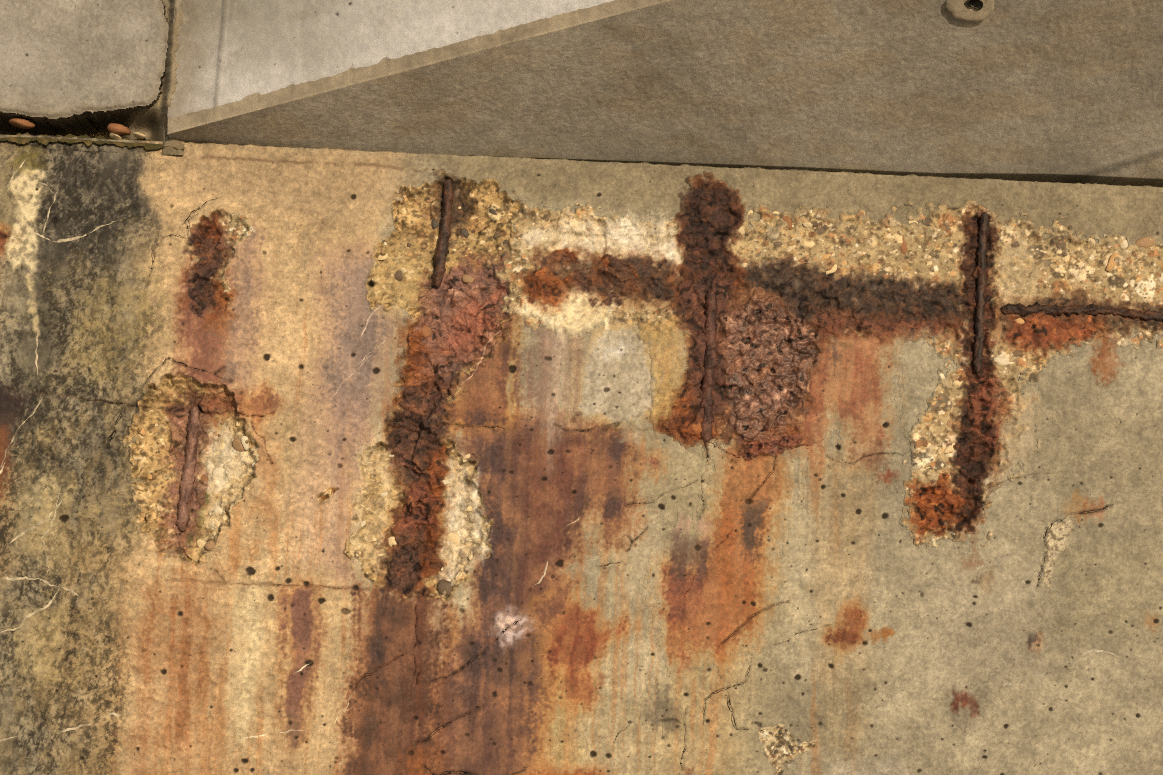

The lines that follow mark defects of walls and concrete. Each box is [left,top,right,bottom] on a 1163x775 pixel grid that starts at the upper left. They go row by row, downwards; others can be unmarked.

rust [0,218,13,292]
damp [3,143,50,338]
rust [0,374,39,520]
spalling [118,372,264,565]
spalling [343,168,1163,601]
crack [628,427,903,518]
rust [91,316,909,775]
crack [217,607,521,751]
crack [417,708,482,775]
crack [663,662,754,774]
crack [718,601,790,647]